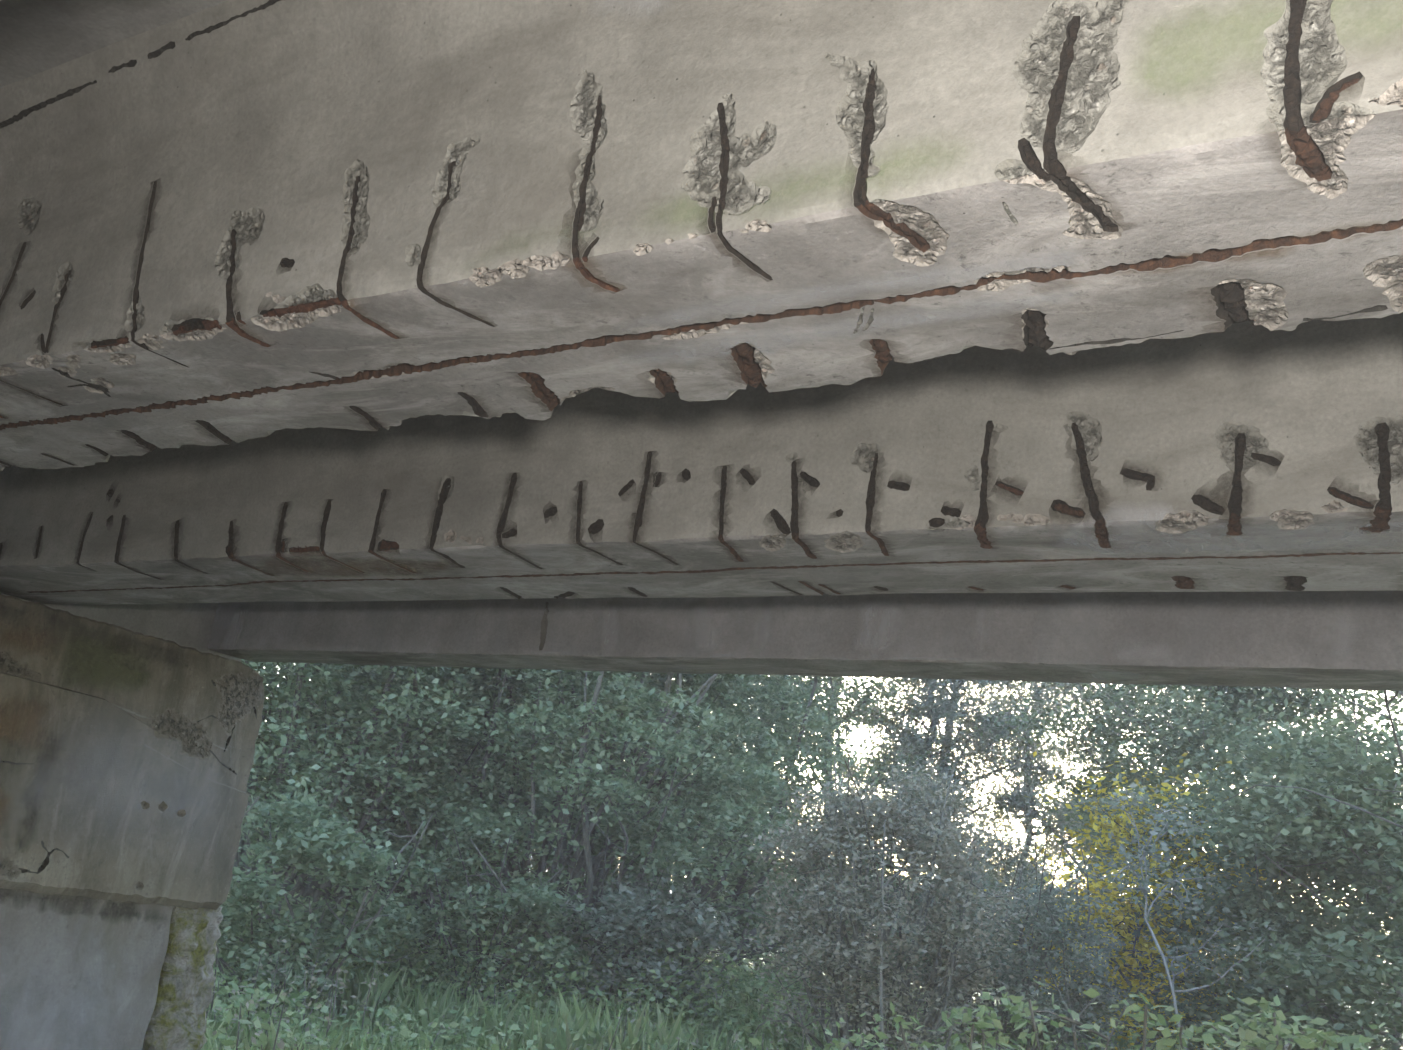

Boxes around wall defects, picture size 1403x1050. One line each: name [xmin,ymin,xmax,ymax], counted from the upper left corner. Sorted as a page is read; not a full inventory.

spalling [1261,0,1403,199]
spalling [994,0,1131,240]
crack [1002,202,1018,224]
crack [853,307,874,334]
spalling [1019,308,1054,351]
crack [1049,330,1184,355]
crack [1303,305,1388,322]
crack [52,368,111,397]
crack [310,372,336,380]
spalling [514,372,615,412]
spalling [648,368,679,398]
spalling [722,342,775,391]